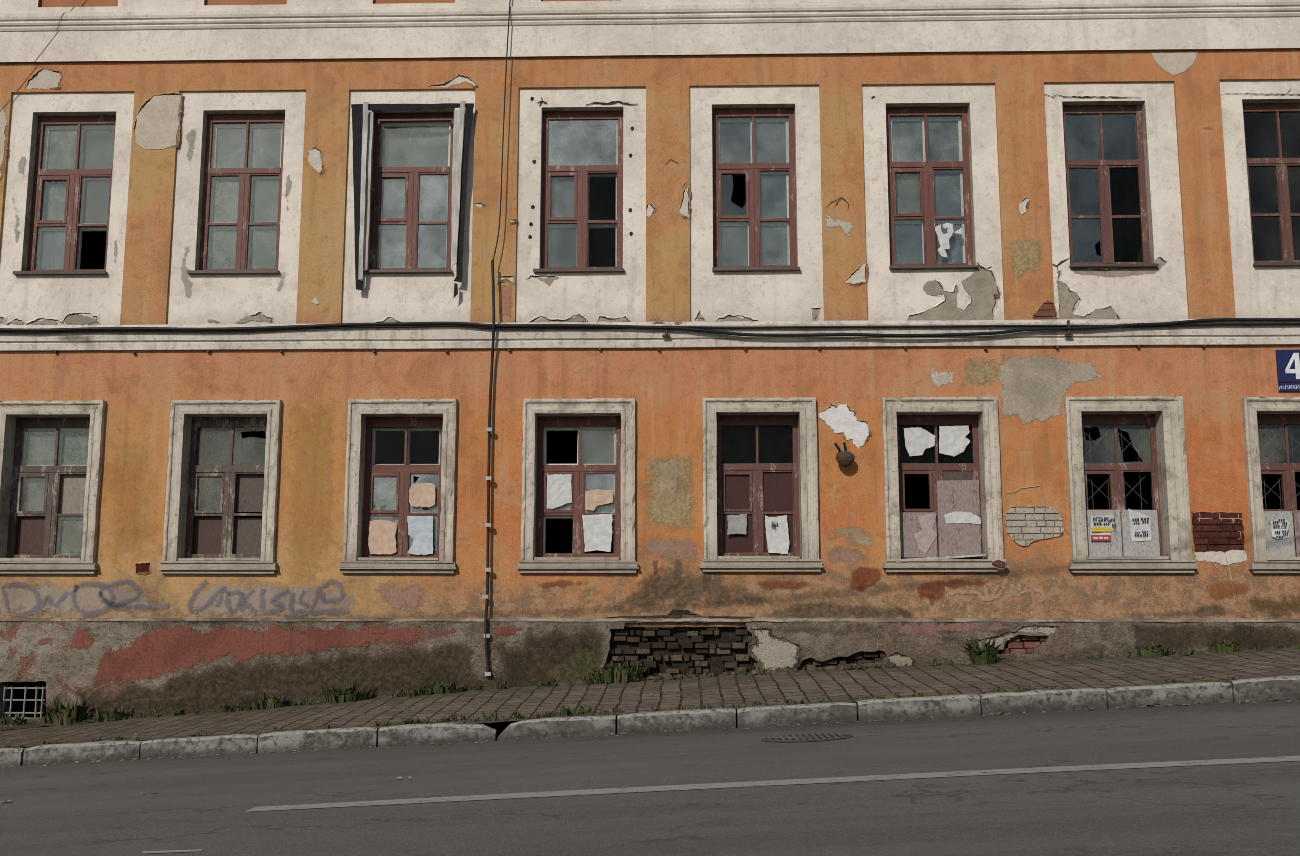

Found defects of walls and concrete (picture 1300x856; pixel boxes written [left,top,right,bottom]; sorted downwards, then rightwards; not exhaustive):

peeling [0,108,26,181]
peeling [133,92,196,161]
peeling [906,239,1042,321]
peeling [1032,256,1168,320]
peeling [818,401,872,447]
peeling [930,354,1102,425]
flaking render [1003,504,1065,547]
flaking render [1190,509,1247,565]
spalling [603,609,916,678]
damp [78,642,478,717]